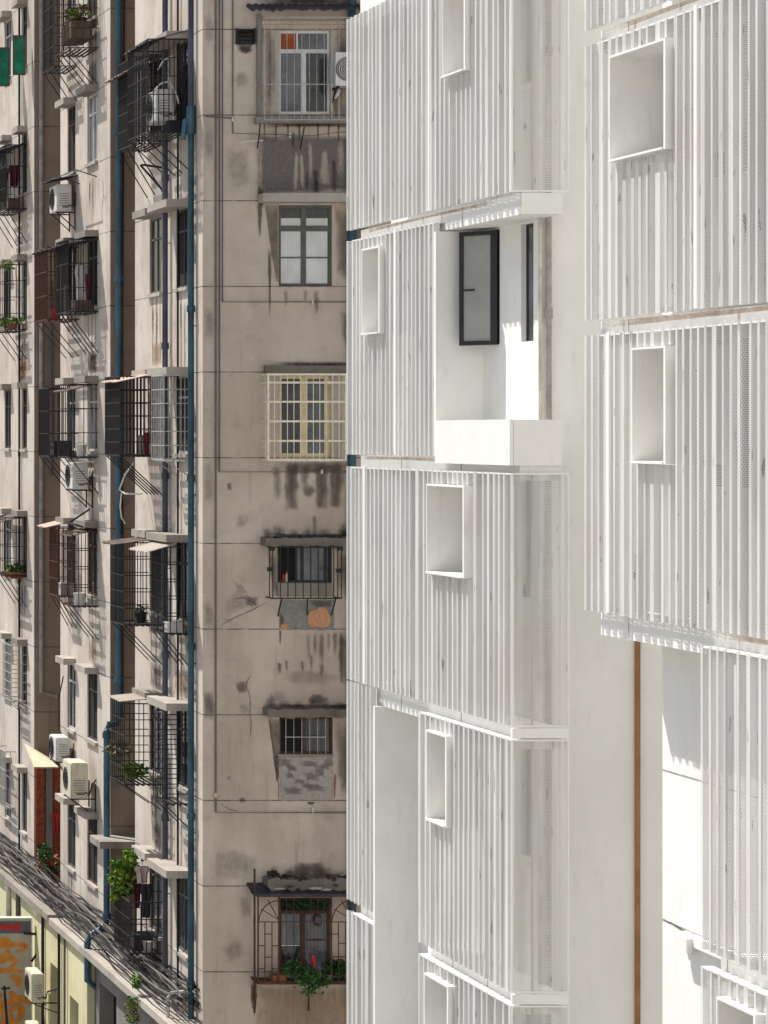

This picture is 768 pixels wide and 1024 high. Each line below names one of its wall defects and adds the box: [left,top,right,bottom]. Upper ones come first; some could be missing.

damp [258,124,367,301]
damp [286,464,341,507]
flaking render [279,600,335,630]
damp [321,635,348,678]
crack [241,675,279,795]